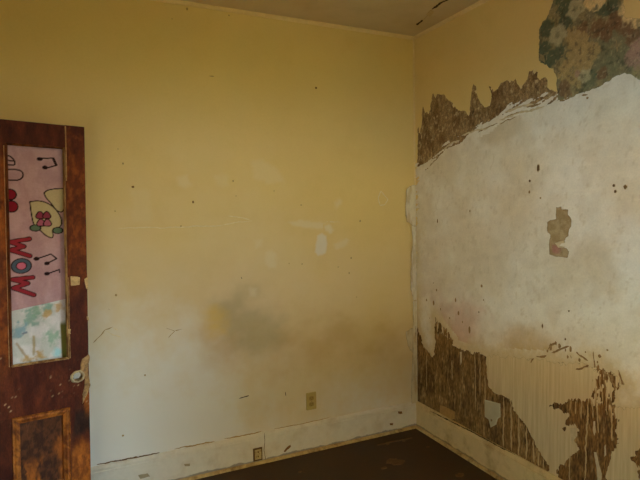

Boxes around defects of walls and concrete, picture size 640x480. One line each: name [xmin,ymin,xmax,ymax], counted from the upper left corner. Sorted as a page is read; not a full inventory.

crack [416,0,448,25]
water stain [185,185,568,404]
flaking render [415,69,640,480]